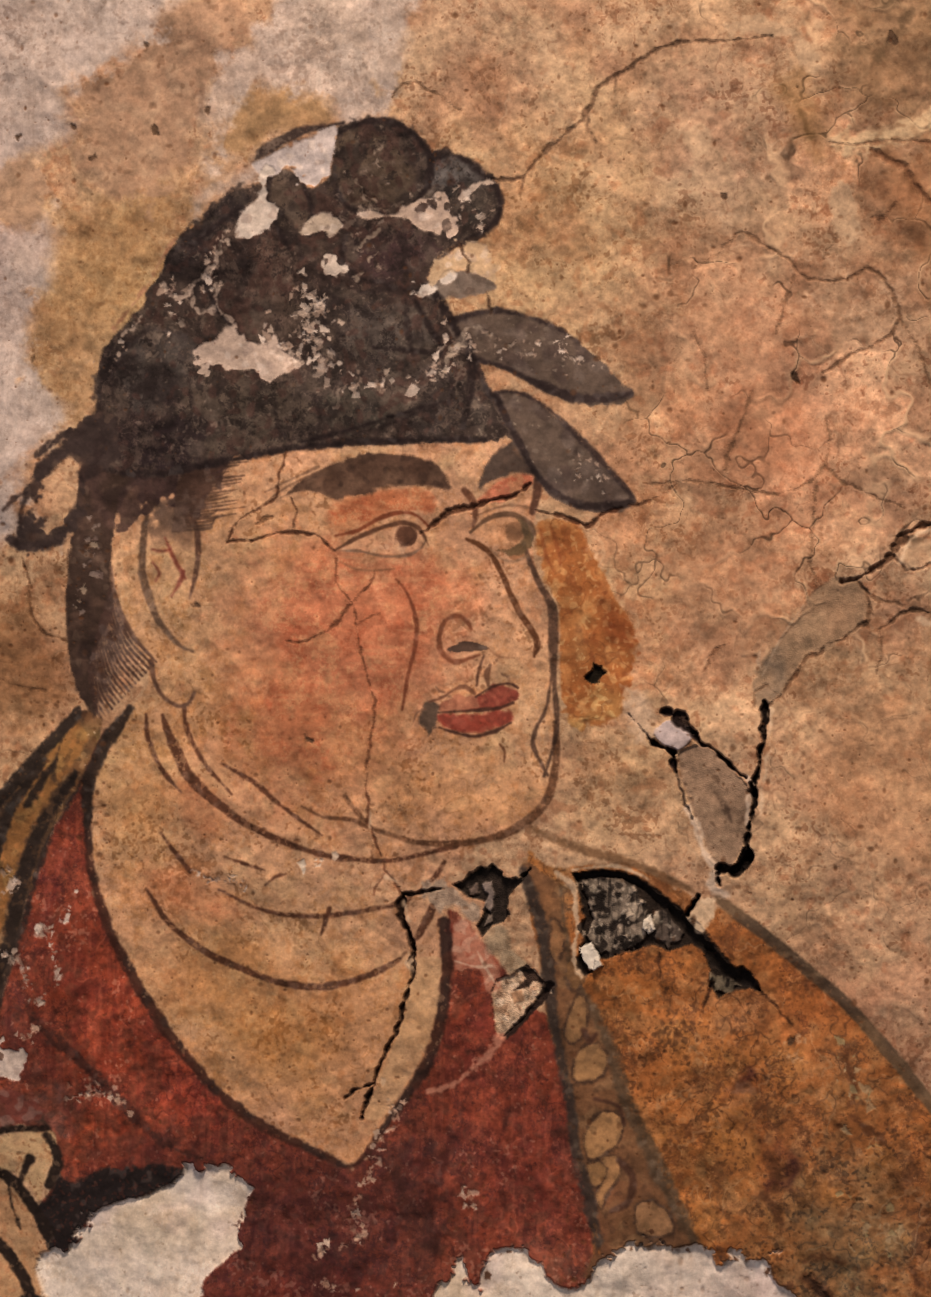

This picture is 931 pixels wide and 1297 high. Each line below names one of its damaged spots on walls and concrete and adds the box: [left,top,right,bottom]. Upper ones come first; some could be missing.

peeling [92,0,596,401]
crack [458,241,494,316]
crack [491,33,774,191]
crack [691,230,931,392]
crack [828,138,931,223]
crack [418,389,931,918]
crack [224,449,443,1122]
peeling [0,888,80,1082]
peeling [303,863,555,1297]
spalling [553,803,761,1001]
peeling [33,1157,258,1297]
peeling [431,1228,830,1297]